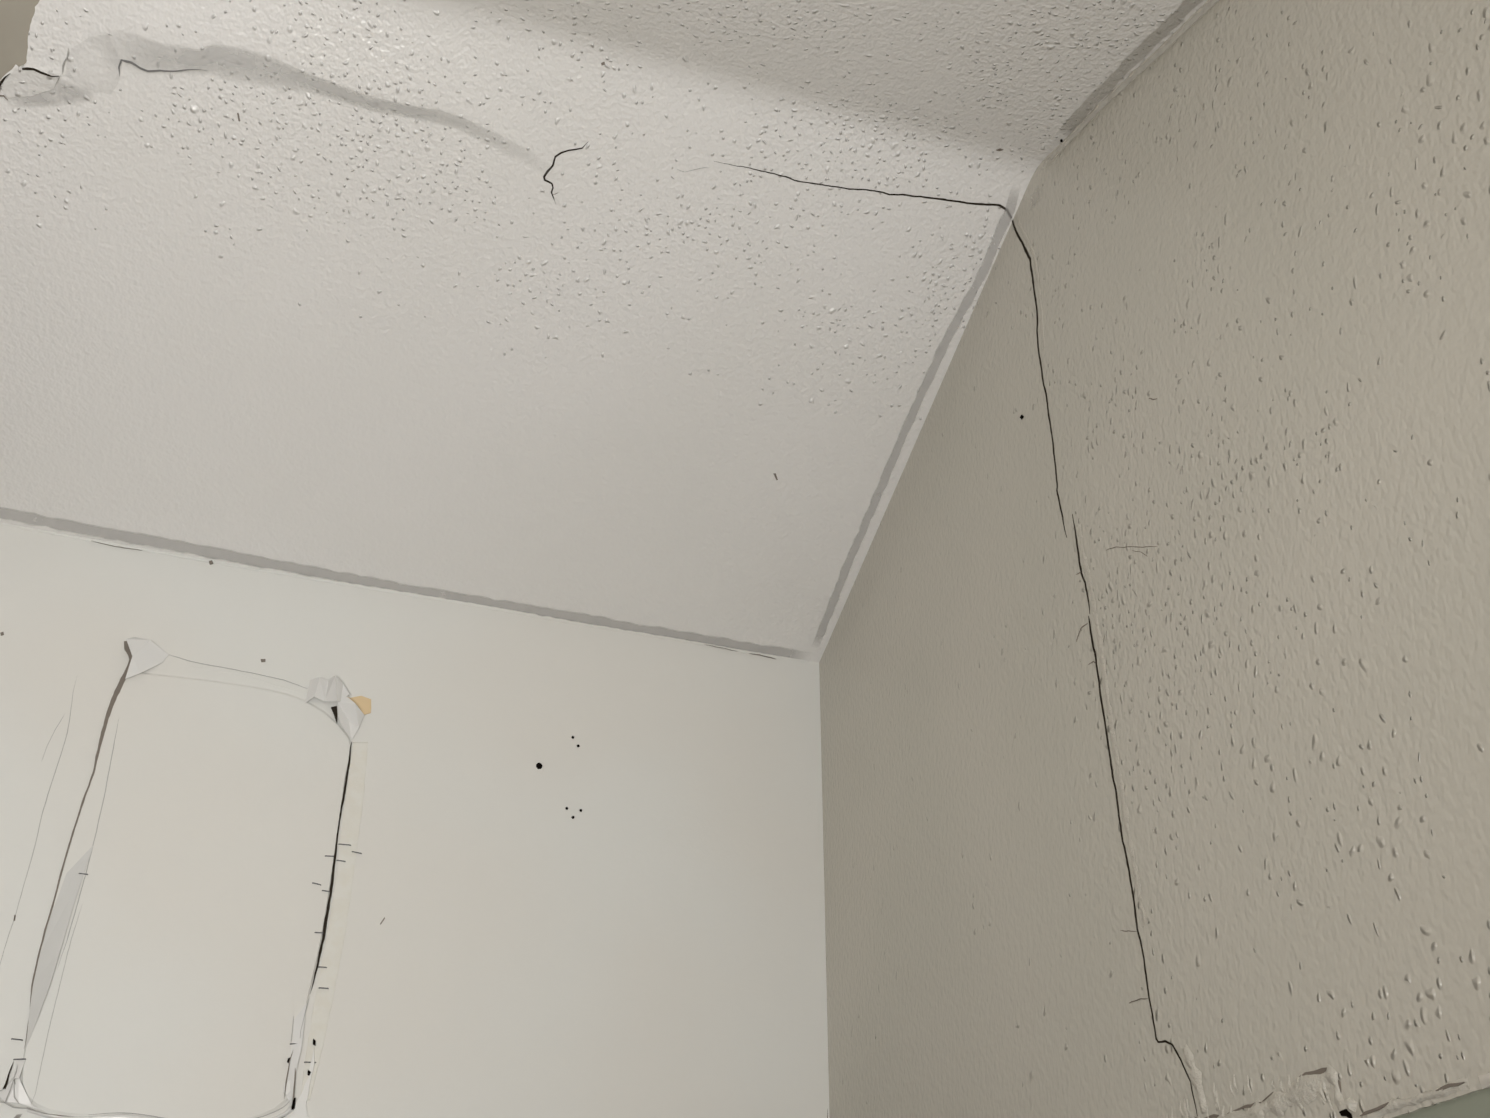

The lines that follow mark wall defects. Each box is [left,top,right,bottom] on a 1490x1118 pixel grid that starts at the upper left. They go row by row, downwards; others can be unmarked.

peeling [0,0,60,100]
crack [543,142,588,201]
crack [677,161,1207,1114]